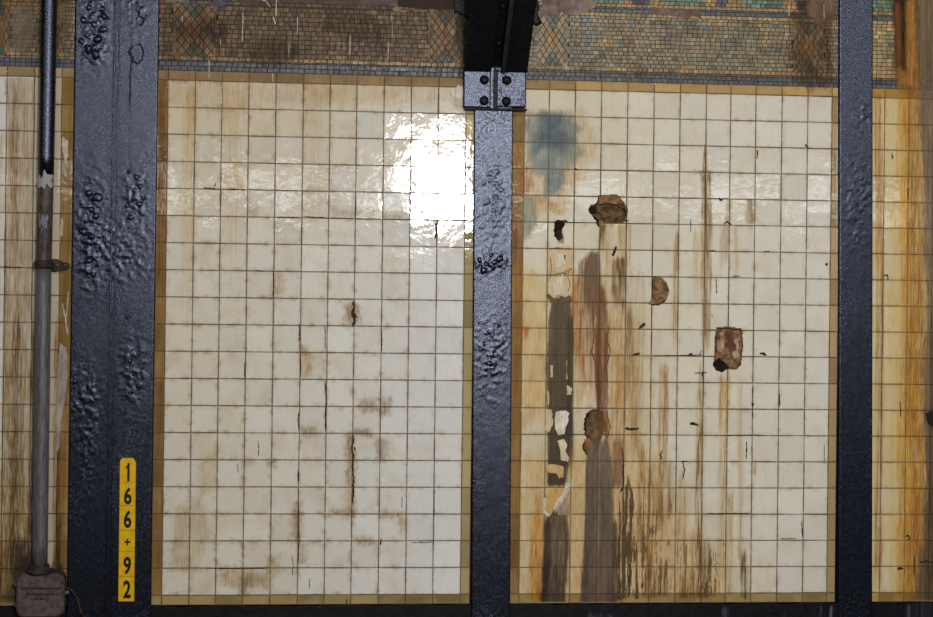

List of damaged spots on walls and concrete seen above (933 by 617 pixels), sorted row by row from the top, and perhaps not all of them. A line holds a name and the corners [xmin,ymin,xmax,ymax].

damp [525,112,579,195]
corrosion [36,175,54,260]
damp [522,198,536,236]
spalling [554,220,568,241]
spalling [588,194,629,227]
crack [350,301,358,327]
corrosion [582,252,611,456]
spalling [649,276,669,306]
spalling [713,326,743,372]
damp [891,0,933,600]
crack [349,433,357,504]
peeling [545,391,571,515]